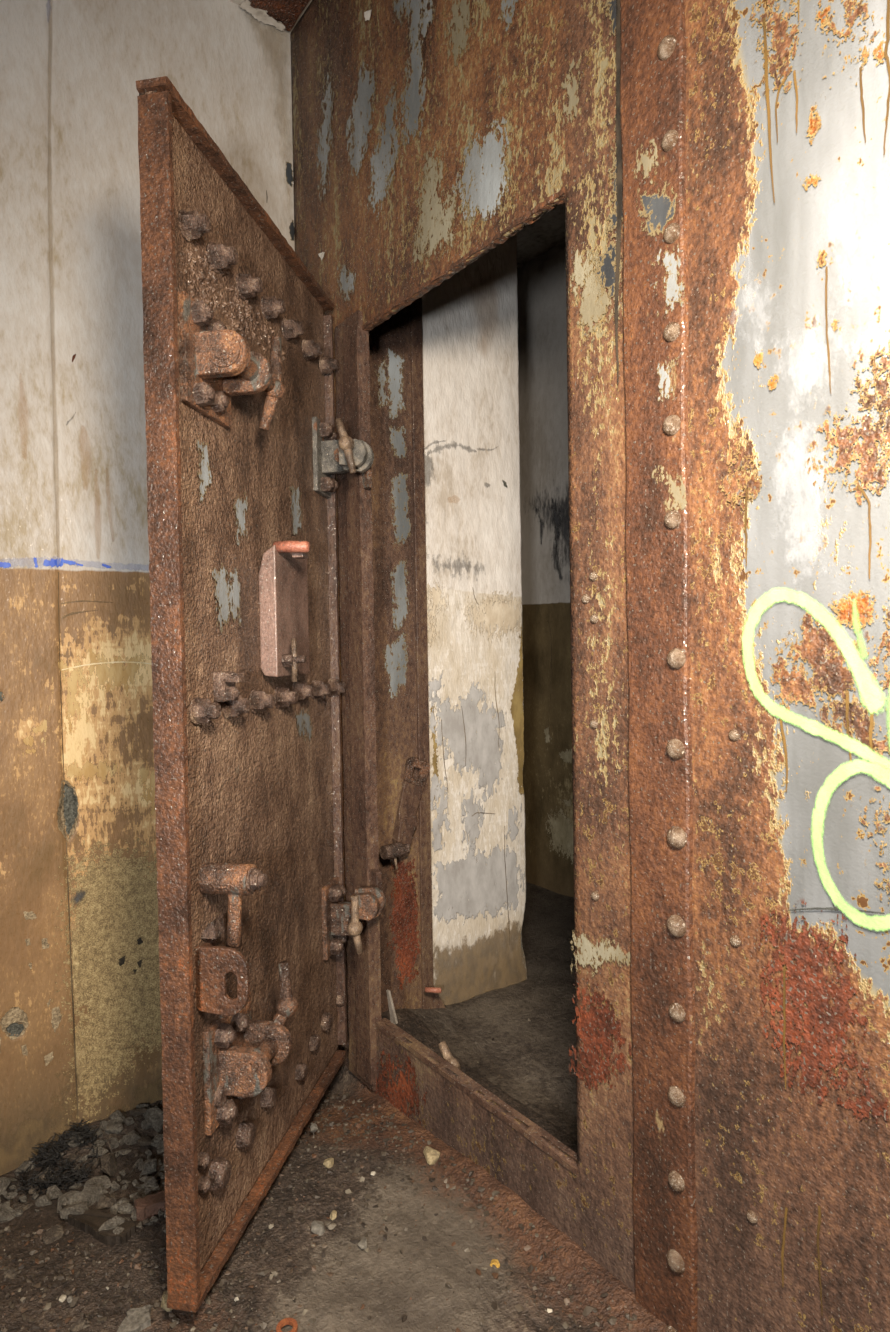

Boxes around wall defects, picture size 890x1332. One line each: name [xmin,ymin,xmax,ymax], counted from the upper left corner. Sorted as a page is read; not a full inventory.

corrosion [749,0,890,203]
corrosion [179,247,286,361]
corrosion [719,437,771,567]
peeling [427,582,449,648]
peeling [23,647,152,756]
peeling [428,591,525,924]
corrosion [387,857,421,990]
corrosion [569,930,632,1098]
corrosion [756,901,890,1127]
corrosion [363,1049,427,1125]